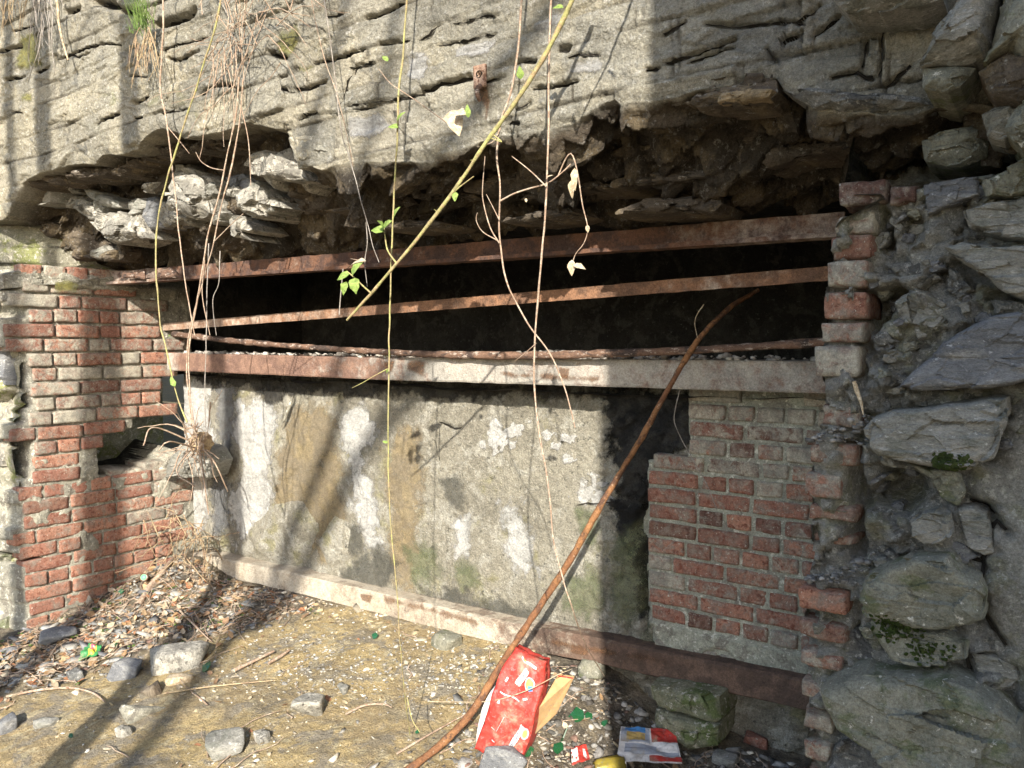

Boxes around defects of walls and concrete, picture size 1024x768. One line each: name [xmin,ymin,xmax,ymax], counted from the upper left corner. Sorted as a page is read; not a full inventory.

corrosion [121,267,183,279]
corrosion [408,360,424,373]
corrosion [542,368,569,379]
spalling [164,442,233,479]
leakage [427,478,531,618]
efflorescence [496,499,541,578]
leakage [575,508,598,545]
leakage [608,472,654,642]